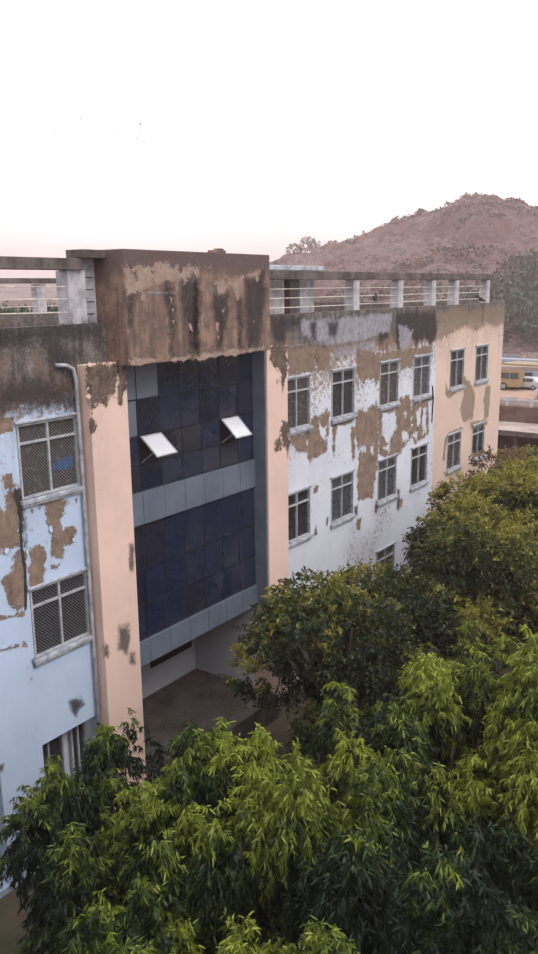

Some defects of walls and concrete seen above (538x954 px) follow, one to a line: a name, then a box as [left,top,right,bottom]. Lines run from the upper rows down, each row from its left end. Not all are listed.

leakage [0,319,101,413]
leakage [165,279,200,353]
peeling [121,257,260,333]
peeling [83,308,433,435]
leakage [213,275,316,349]
leakage [379,303,506,351]
peeling [0,417,14,439]
peeling [274,395,429,502]
crack [14,489,27,611]
peeling [0,473,79,621]